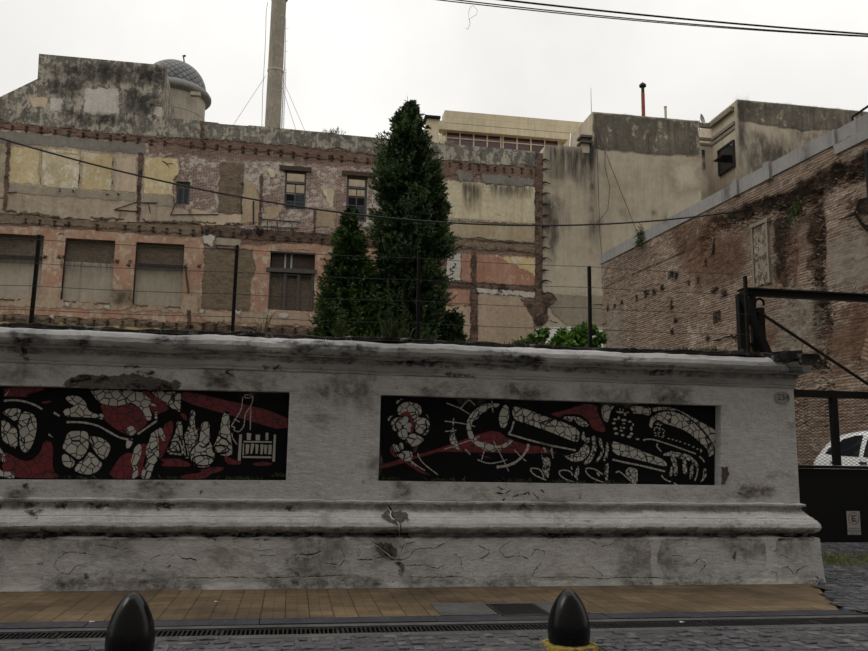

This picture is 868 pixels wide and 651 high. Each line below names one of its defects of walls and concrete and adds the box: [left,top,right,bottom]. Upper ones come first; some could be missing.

leakage [49,66,162,92]
flaking render [0,122,377,164]
peeling [64,373,181,392]
spalling [381,510,410,523]
crack [150,503,707,580]